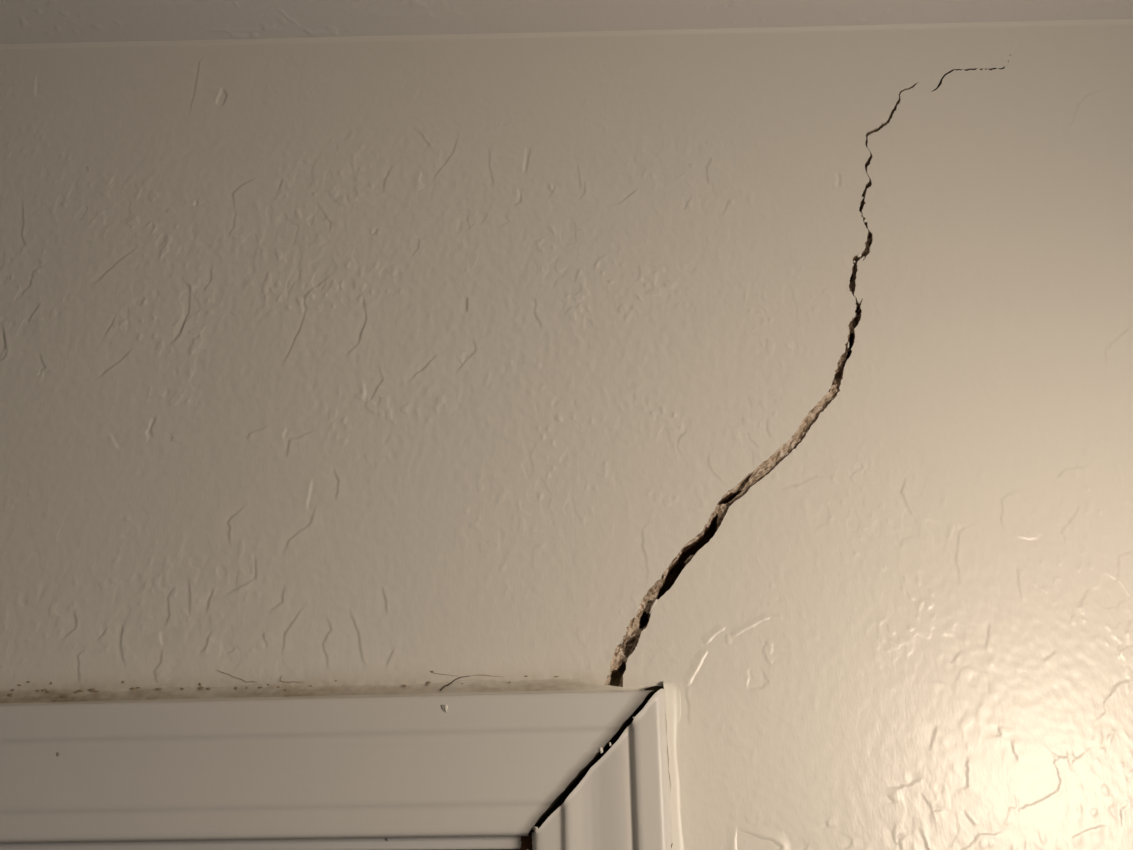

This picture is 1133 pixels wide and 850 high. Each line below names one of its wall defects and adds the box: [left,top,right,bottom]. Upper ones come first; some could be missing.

crack [532,61,1009,831]